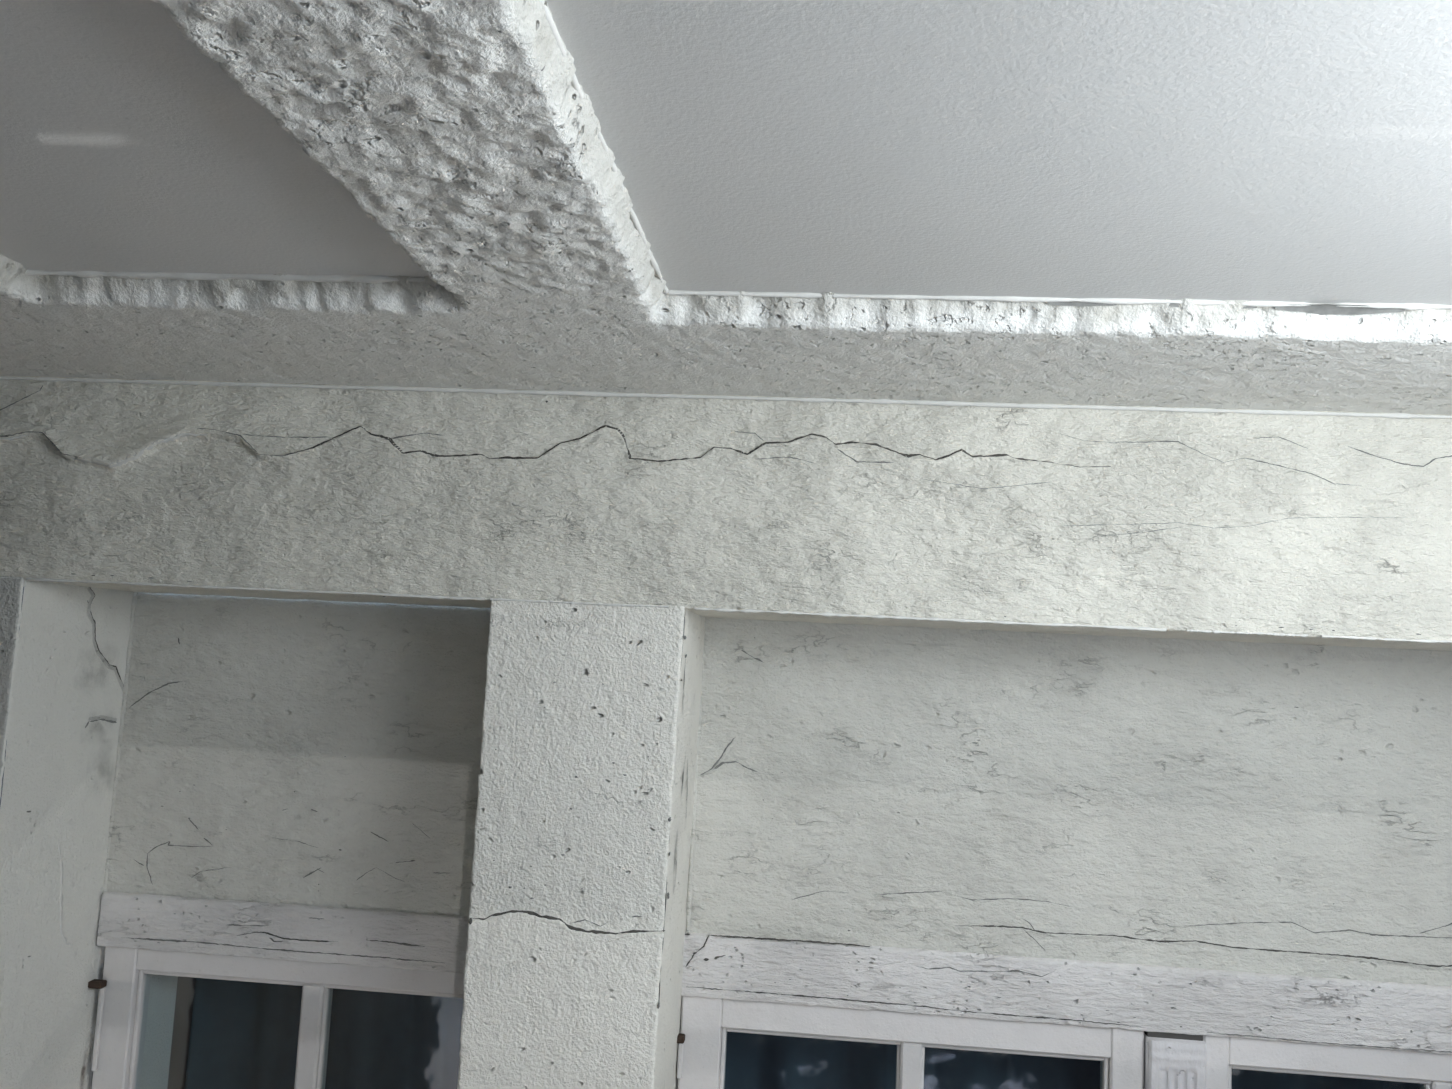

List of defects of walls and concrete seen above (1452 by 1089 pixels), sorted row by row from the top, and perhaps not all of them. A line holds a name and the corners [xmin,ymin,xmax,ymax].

crack [244,425,1452,536]
crack [85,587,180,728]
crack [130,918,443,963]
crack [468,910,1140,1027]
crack [792,891,1452,977]